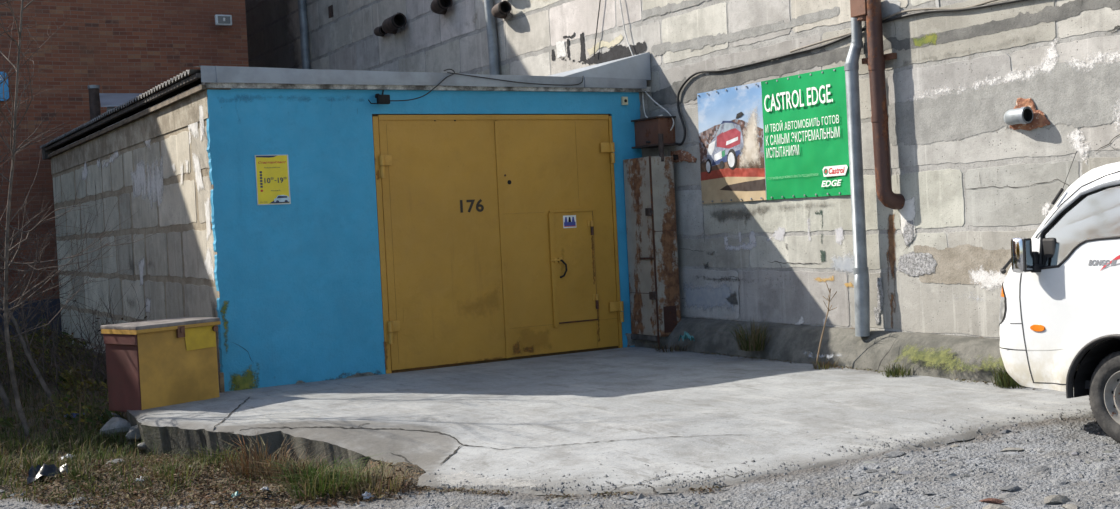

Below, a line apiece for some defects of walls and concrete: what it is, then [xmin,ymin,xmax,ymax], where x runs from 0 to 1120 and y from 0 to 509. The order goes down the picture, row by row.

crack [971,175,1070,189]
corrosion [887,215,896,327]
spalling [897,220,937,277]